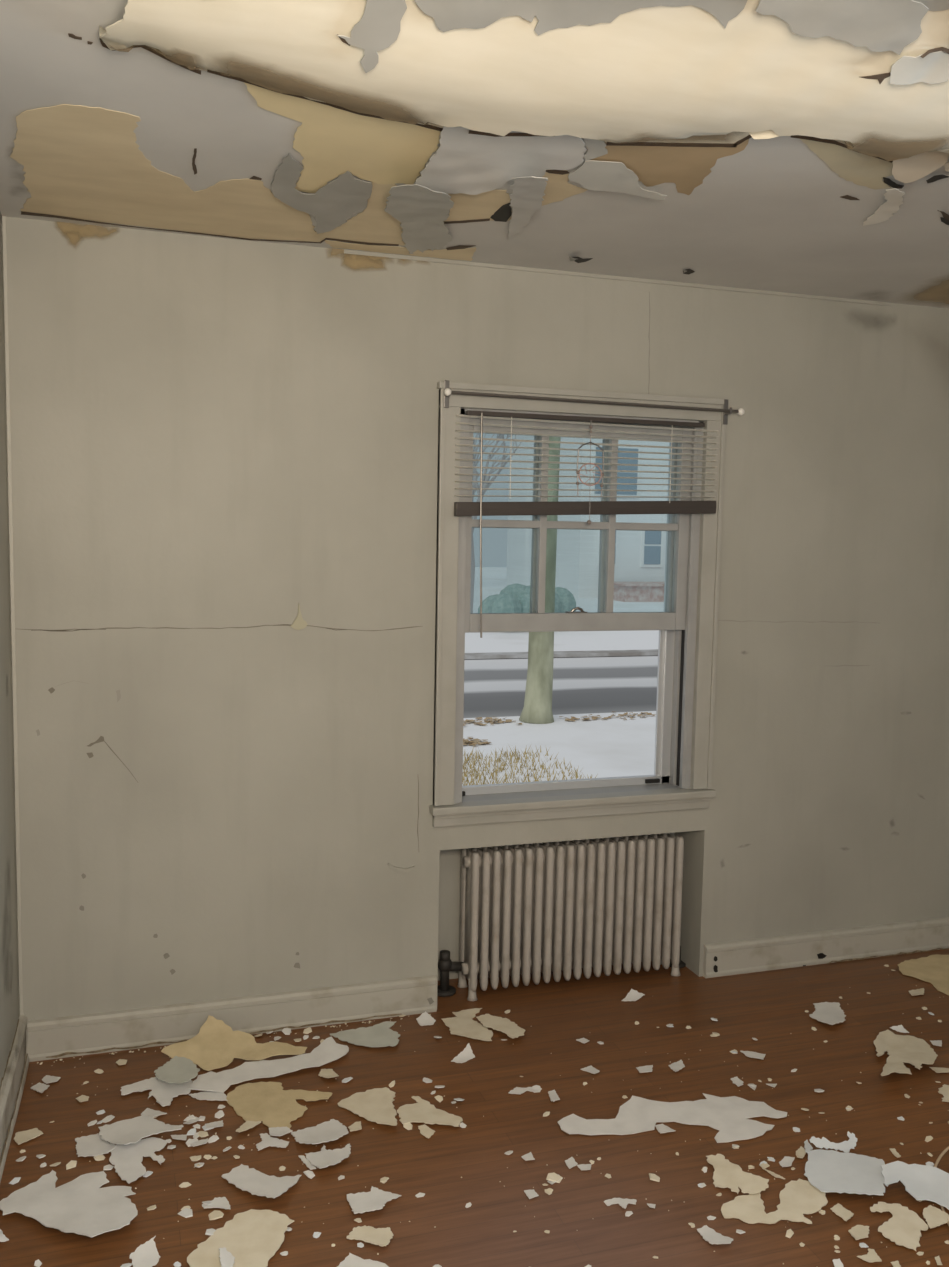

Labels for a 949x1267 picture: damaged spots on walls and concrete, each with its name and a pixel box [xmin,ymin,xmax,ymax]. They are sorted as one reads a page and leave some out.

peeling [337,0,949,85]
peeling [10,82,749,261]
peeling [801,139,949,226]
crack [22,604,422,632]